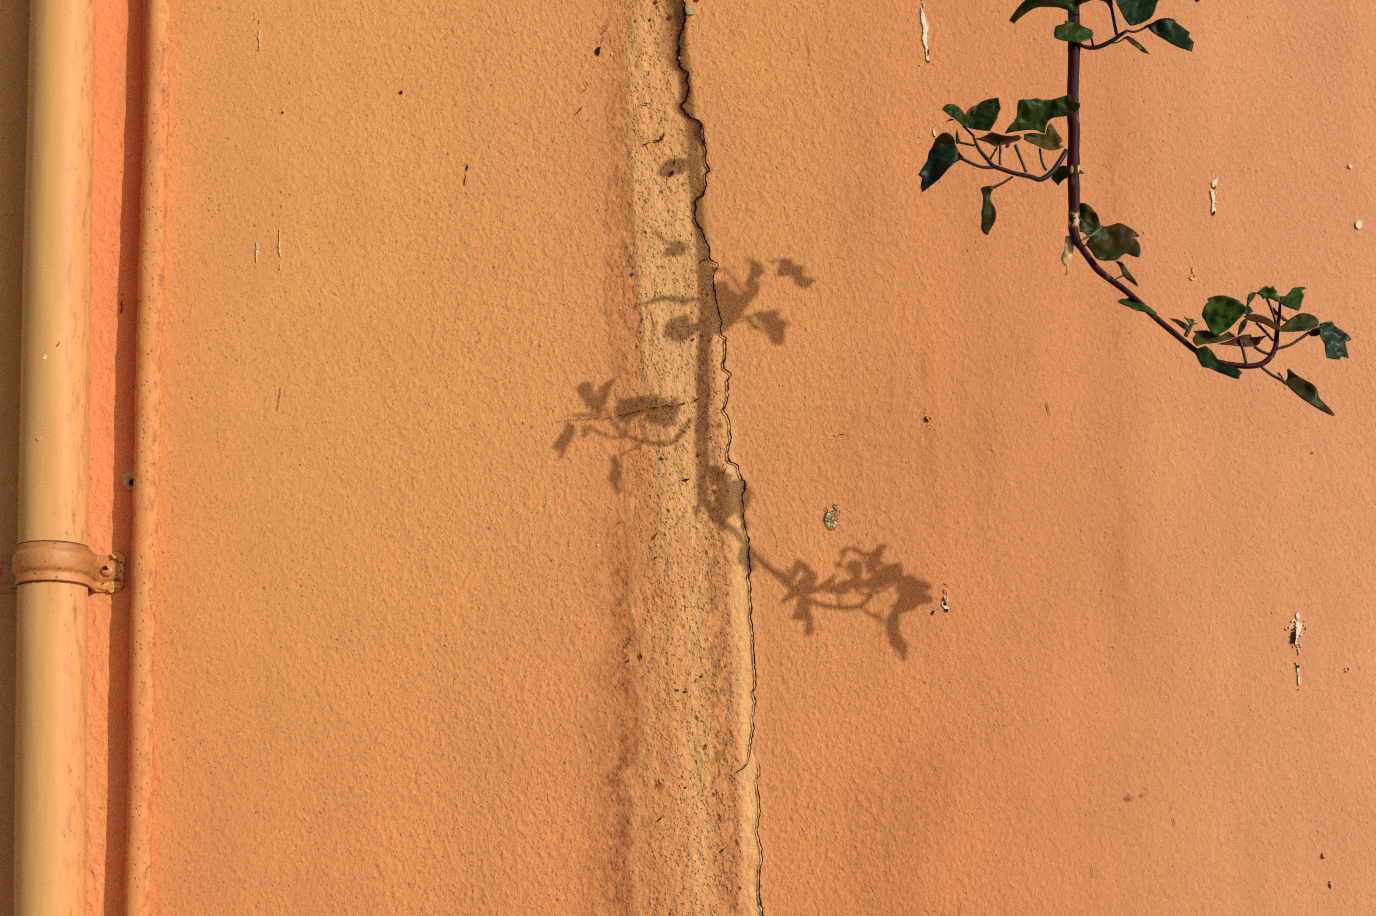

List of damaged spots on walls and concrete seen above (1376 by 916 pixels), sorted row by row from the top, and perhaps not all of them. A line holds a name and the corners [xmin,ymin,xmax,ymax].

crack [553,0,764,916]
spalling [824,503,840,531]
peeling [1285,612,1303,690]